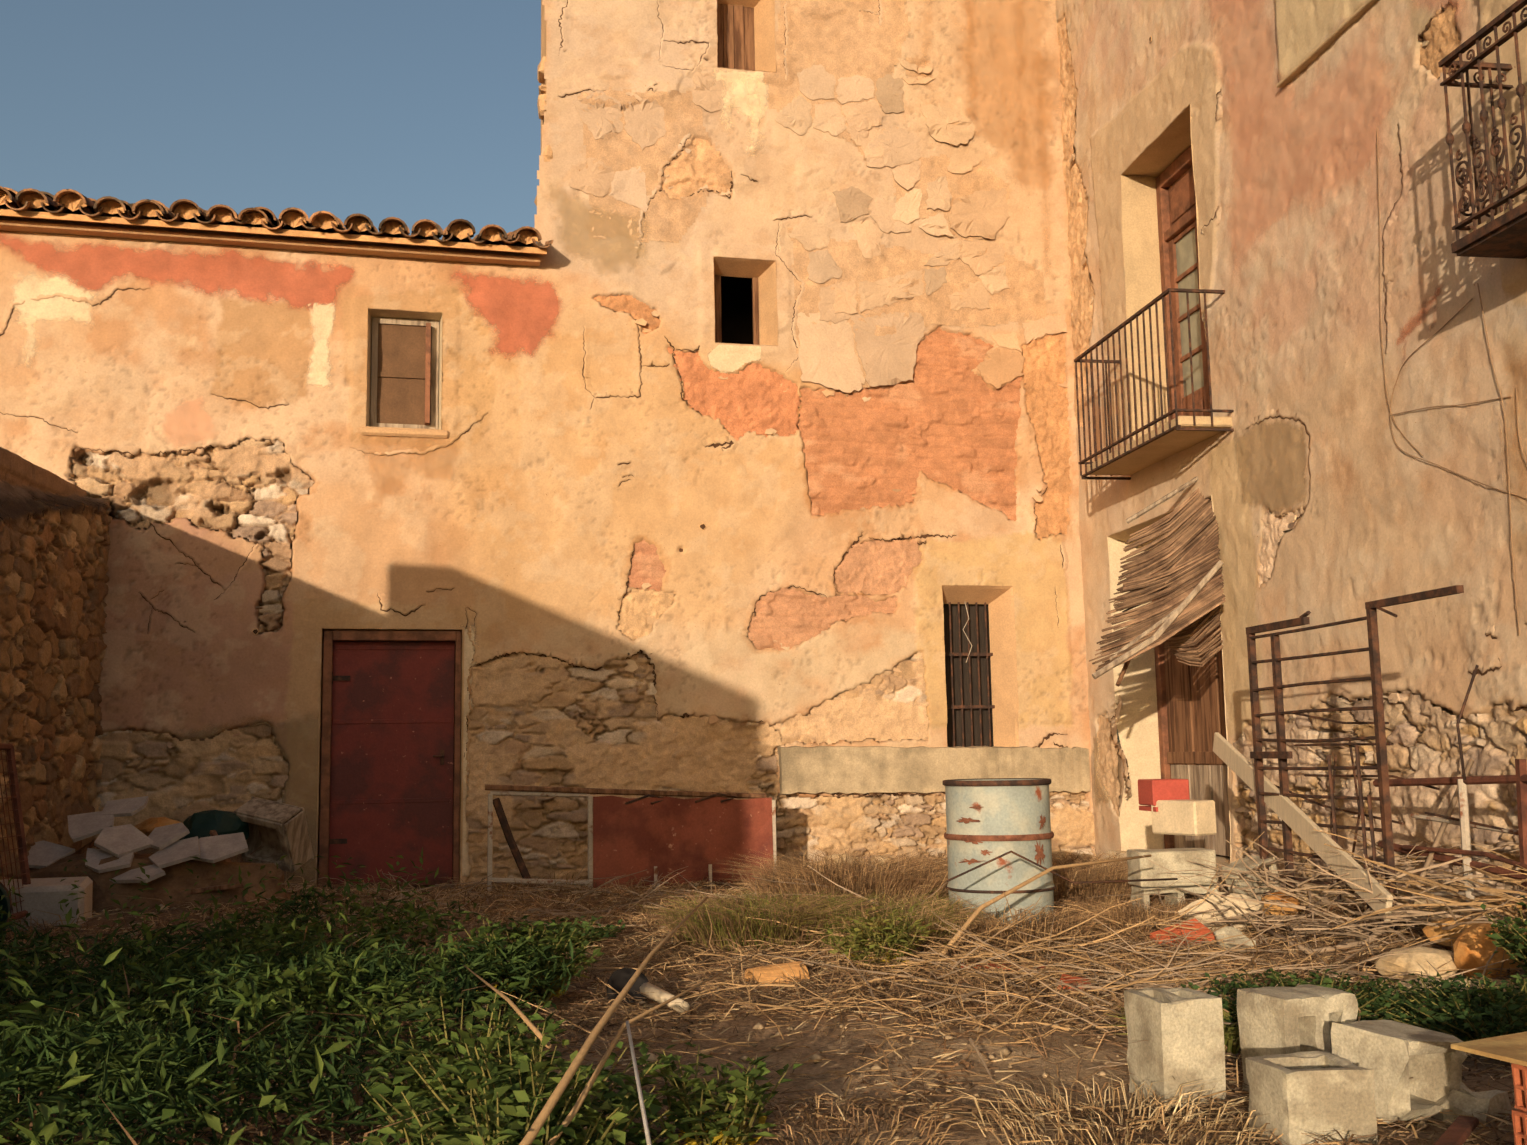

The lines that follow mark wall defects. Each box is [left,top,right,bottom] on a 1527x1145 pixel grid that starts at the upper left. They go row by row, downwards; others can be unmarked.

flaking render [1420,2,1461,79]
crack [0,282,152,336]
flaking render [568,71,733,243]
flaking render [667,0,1095,540]
crack [1382,120,1410,353]
crack [349,409,488,457]
flaking render [69,438,314,634]
flaking render [95,722,290,837]
flaking render [466,540,947,885]
flaking render [1049,791,1095,859]
flaking render [1232,691,1527,897]
crack [1468,613,1527,711]